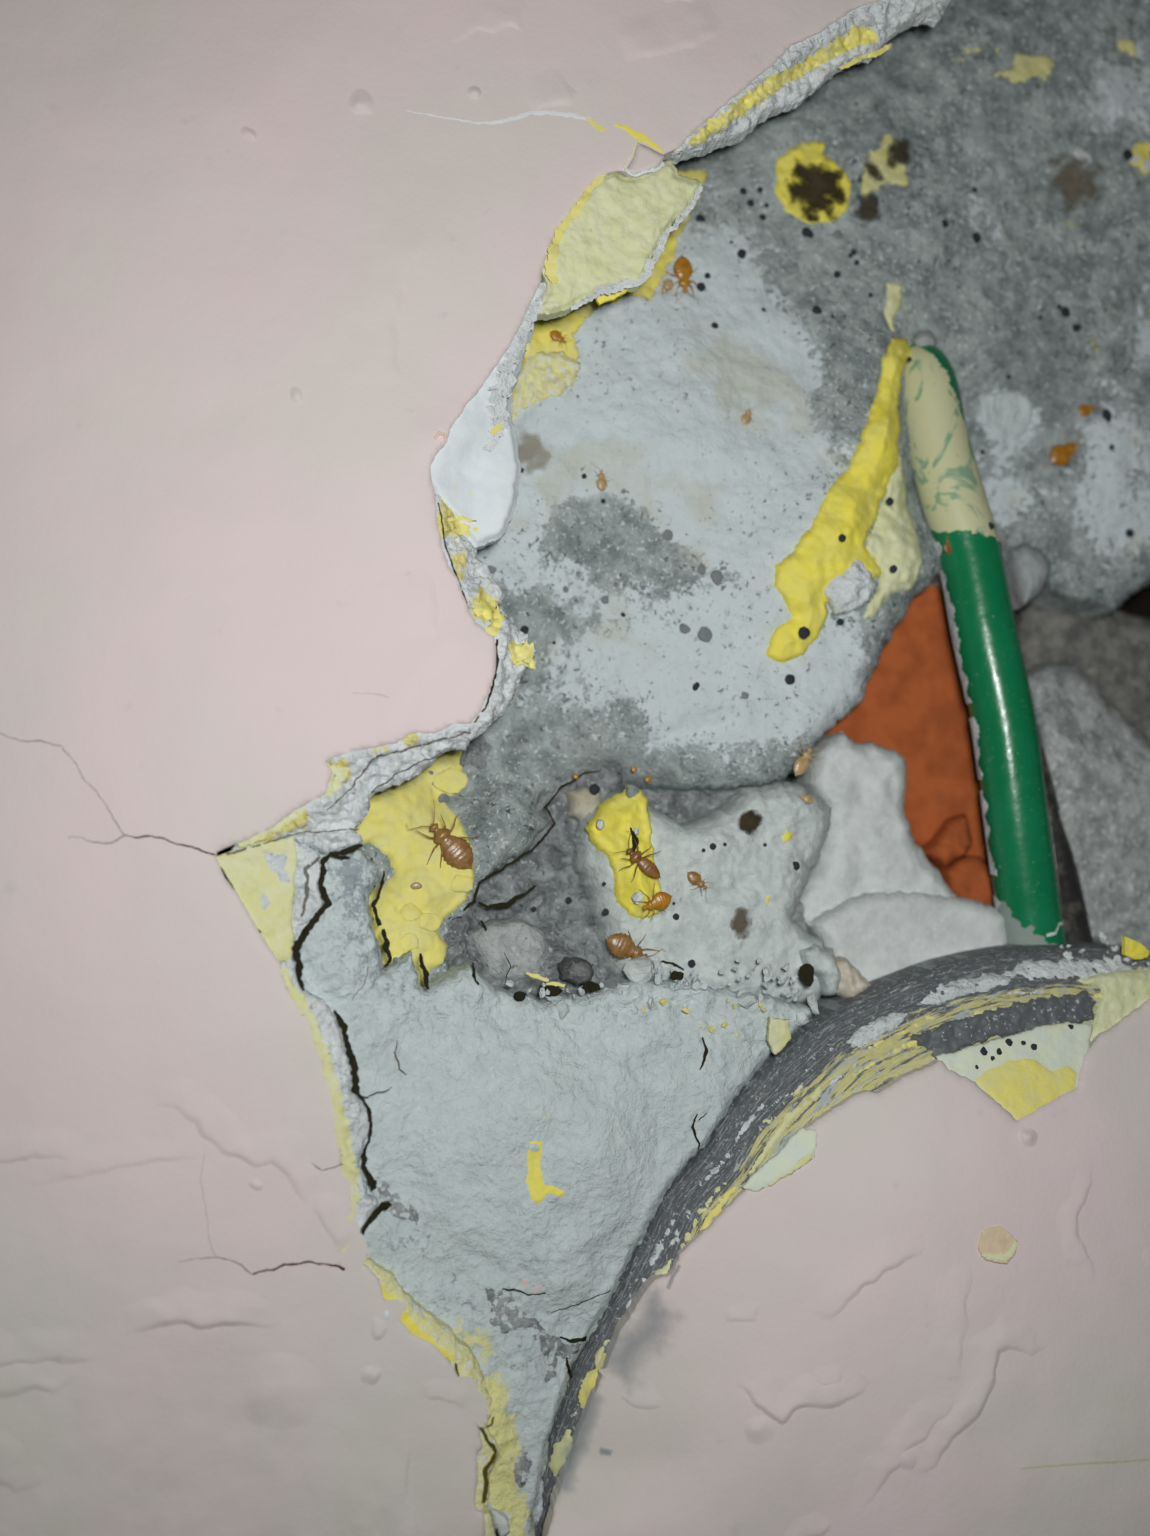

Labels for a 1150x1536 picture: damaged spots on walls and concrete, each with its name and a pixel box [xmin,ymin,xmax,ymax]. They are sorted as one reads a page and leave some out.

water stain [789,142,909,221]
crack [0,733,215,855]
flaking render [216,712,486,963]
crack [449,768,602,985]
flaking render [279,0,1150,1536]
crack [291,844,429,1235]
crack [180,1154,345,1275]